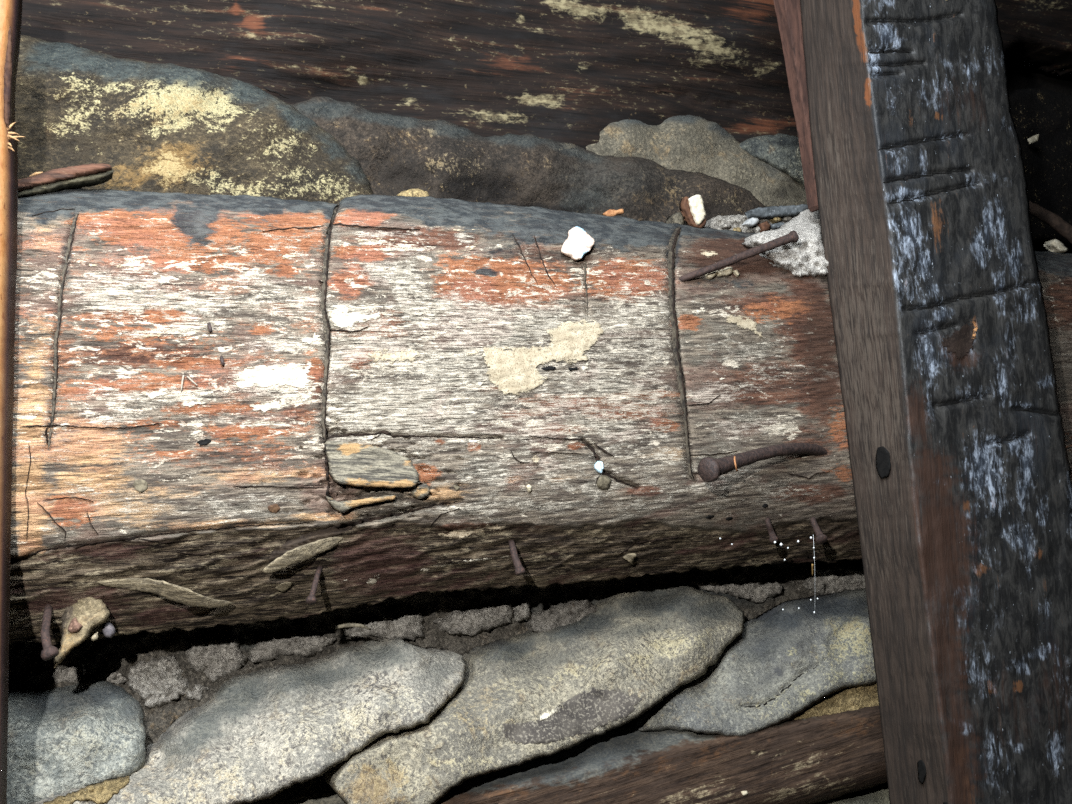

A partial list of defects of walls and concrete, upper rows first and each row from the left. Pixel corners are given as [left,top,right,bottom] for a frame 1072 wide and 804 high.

peeling [679,195,706,228]
peeling [560,226,595,261]
peeling [153,260,205,286]
peeling [328,307,381,330]
peeling [368,349,421,364]
peeling [466,319,604,397]
peeling [144,388,170,399]
peeling [233,362,314,413]
peeling [438,524,506,539]